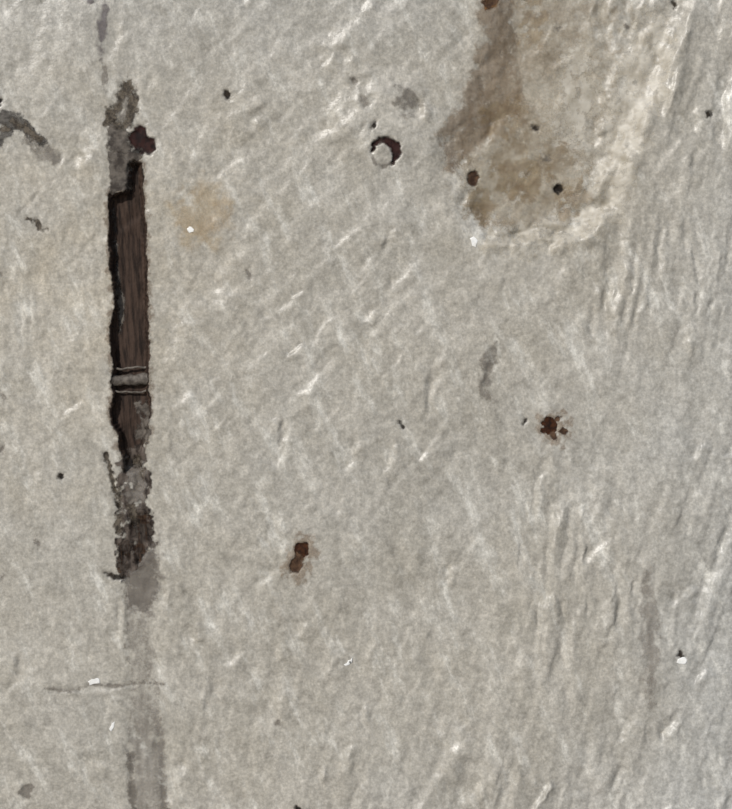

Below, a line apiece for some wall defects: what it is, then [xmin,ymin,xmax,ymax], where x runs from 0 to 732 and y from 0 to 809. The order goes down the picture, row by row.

corrosion [483,0,499,10]
peeling [102,79,143,195]
corrosion [129,125,156,155]